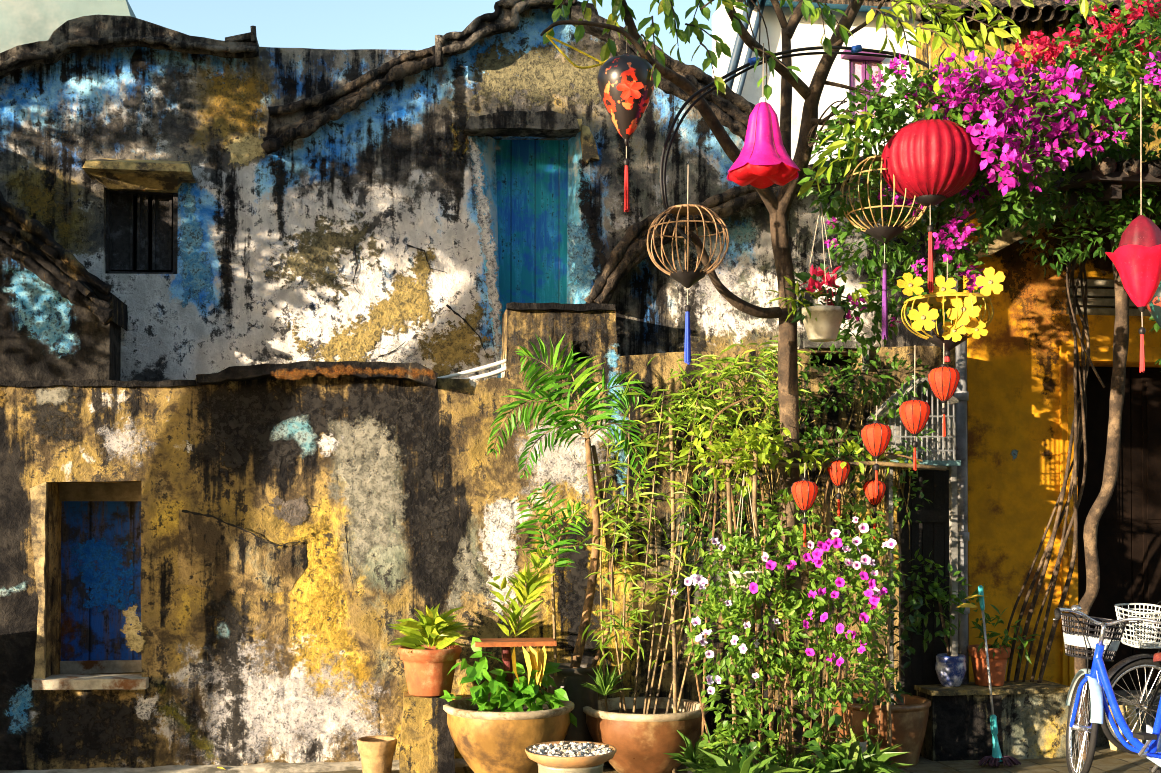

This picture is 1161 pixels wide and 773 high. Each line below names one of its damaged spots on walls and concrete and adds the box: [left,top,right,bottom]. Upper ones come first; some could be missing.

damp [0,51,234,337]
peeling [180,182,215,308]
spalling [263,128,502,377]
damp [270,63,500,239]
damp [194,376,460,595]